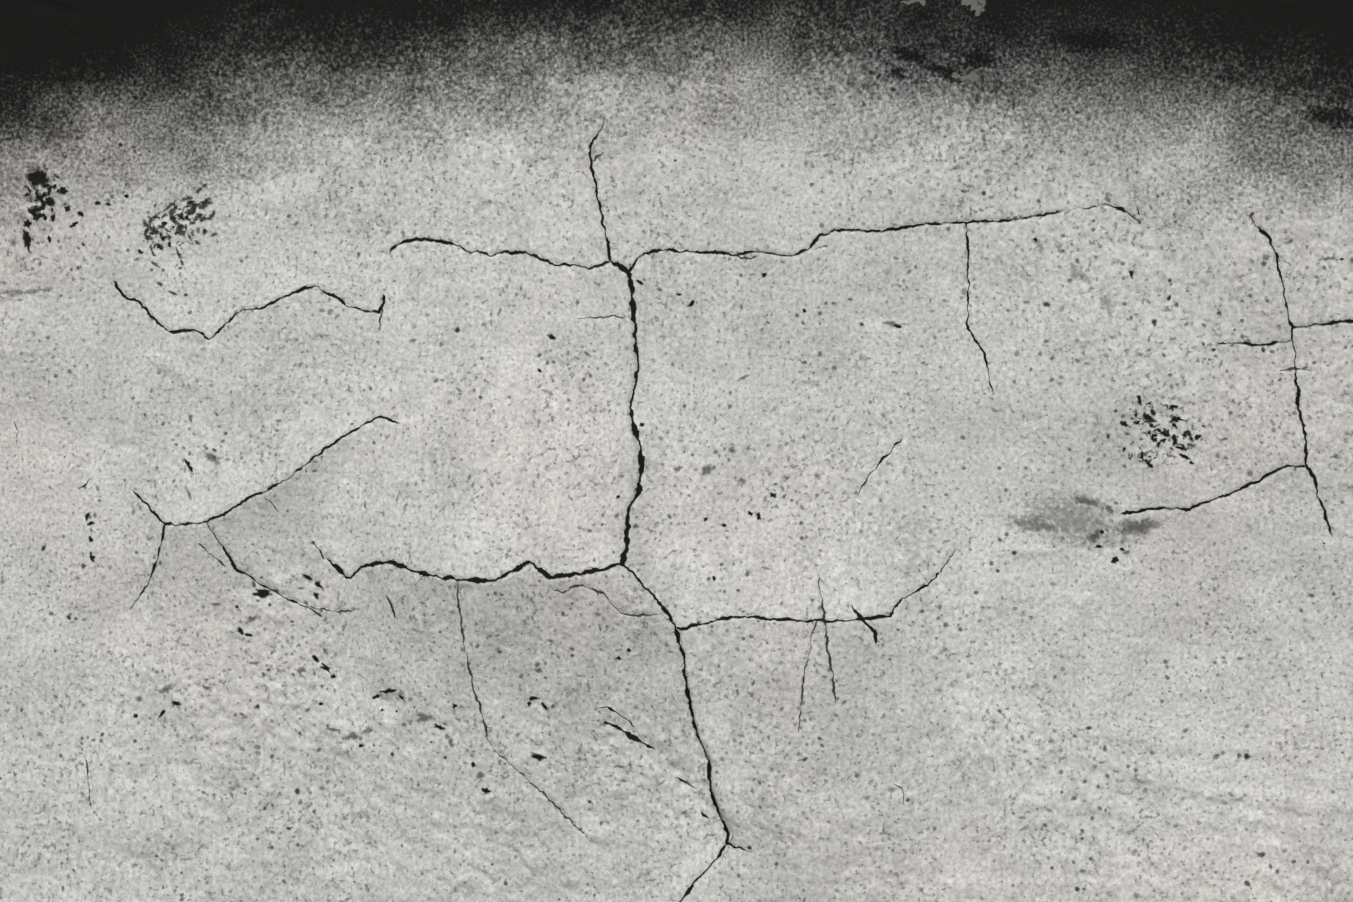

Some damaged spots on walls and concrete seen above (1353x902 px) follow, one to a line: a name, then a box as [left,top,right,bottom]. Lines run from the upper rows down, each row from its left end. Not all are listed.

crack [113,117,1141,902]
crack [1121,216,1353,537]